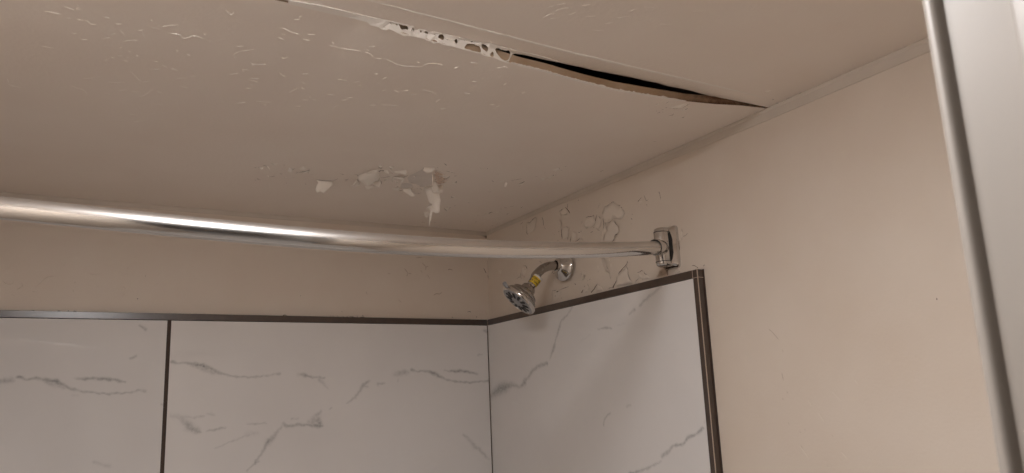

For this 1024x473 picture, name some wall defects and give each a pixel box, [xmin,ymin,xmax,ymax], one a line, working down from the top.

peeling [423,167,443,226]